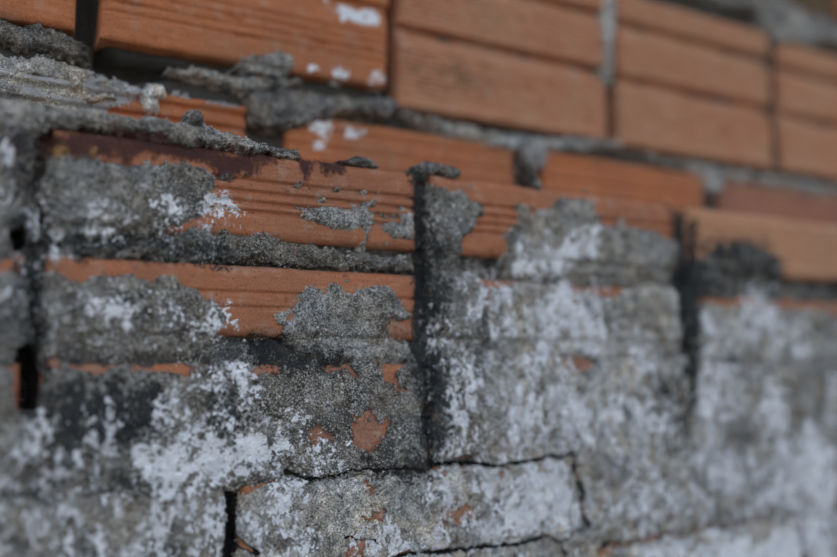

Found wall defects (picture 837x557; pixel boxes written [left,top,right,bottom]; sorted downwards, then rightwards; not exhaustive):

flaking render [0,129,234,255]
damp [0,122,837,557]
flaking render [0,181,837,557]
crack [222,490,261,557]
crack [283,450,612,557]